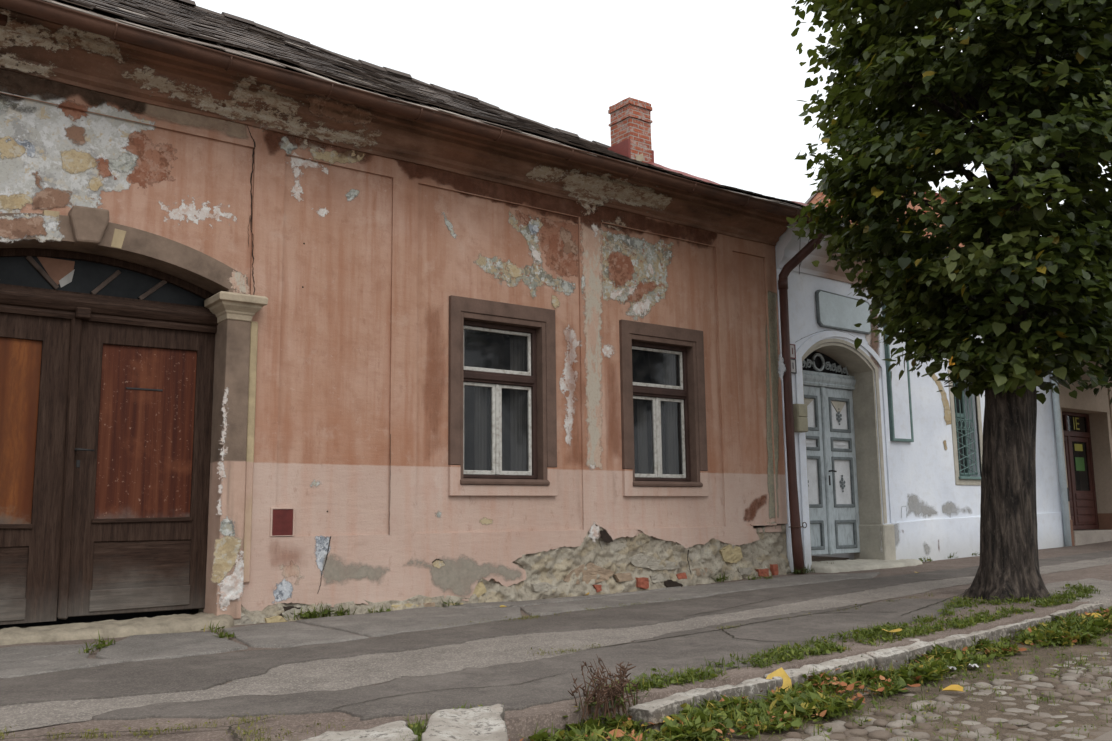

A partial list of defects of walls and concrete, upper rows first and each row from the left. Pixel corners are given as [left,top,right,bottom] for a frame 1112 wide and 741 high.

peeling [0,91,178,243]
peeling [0,9,382,217]
peeling [158,195,237,228]
peeling [474,163,674,470]
spalling [211,387,792,625]